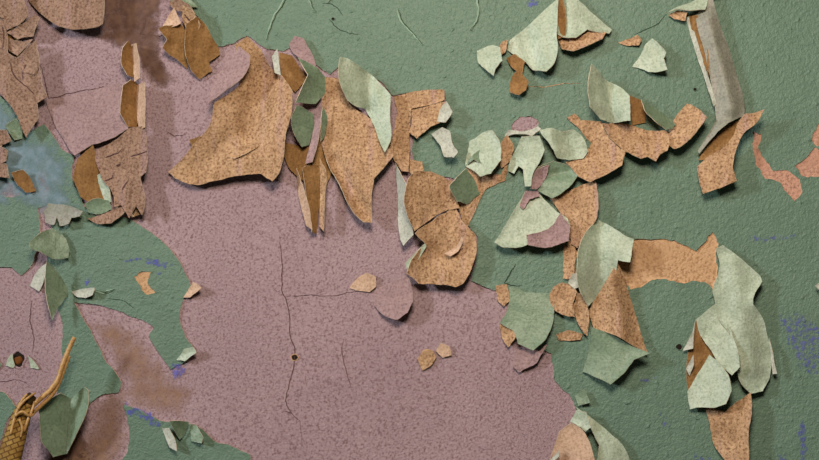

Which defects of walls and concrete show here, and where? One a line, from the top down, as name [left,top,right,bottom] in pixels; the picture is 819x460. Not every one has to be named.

crack [266,0,286,39]
crack [308,0,354,34]
crack [396,8,423,46]
crack [469,0,479,31]
peeling [618,35,668,72]
peeling [667,0,819,201]
flaking render [0,0,629,460]
peeling [404,63,777,460]
crack [279,236,357,442]